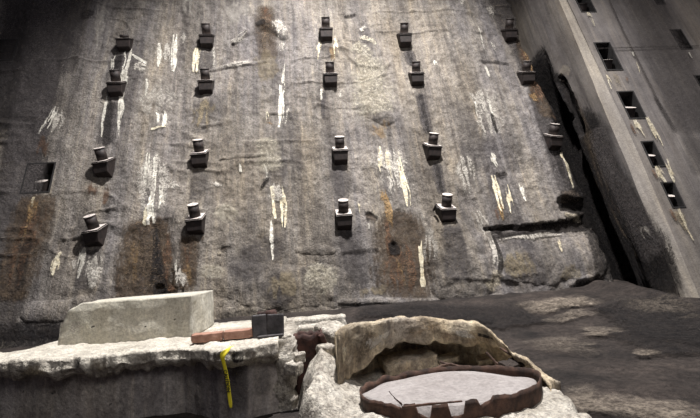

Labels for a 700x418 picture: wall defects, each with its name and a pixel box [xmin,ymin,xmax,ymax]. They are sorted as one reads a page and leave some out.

leakage [98,95,124,145]
efflorescence [110,49,147,81]
efflorescence [278,65,289,127]
leakage [469,90,503,133]
leakage [0,0,92,349]
efflorescence [136,153,179,225]
efflorescence [371,146,411,206]
leakage [487,0,700,353]
rust [0,193,56,301]
leakage [231,183,287,279]
rust [363,191,432,298]
crack [485,218,588,274]